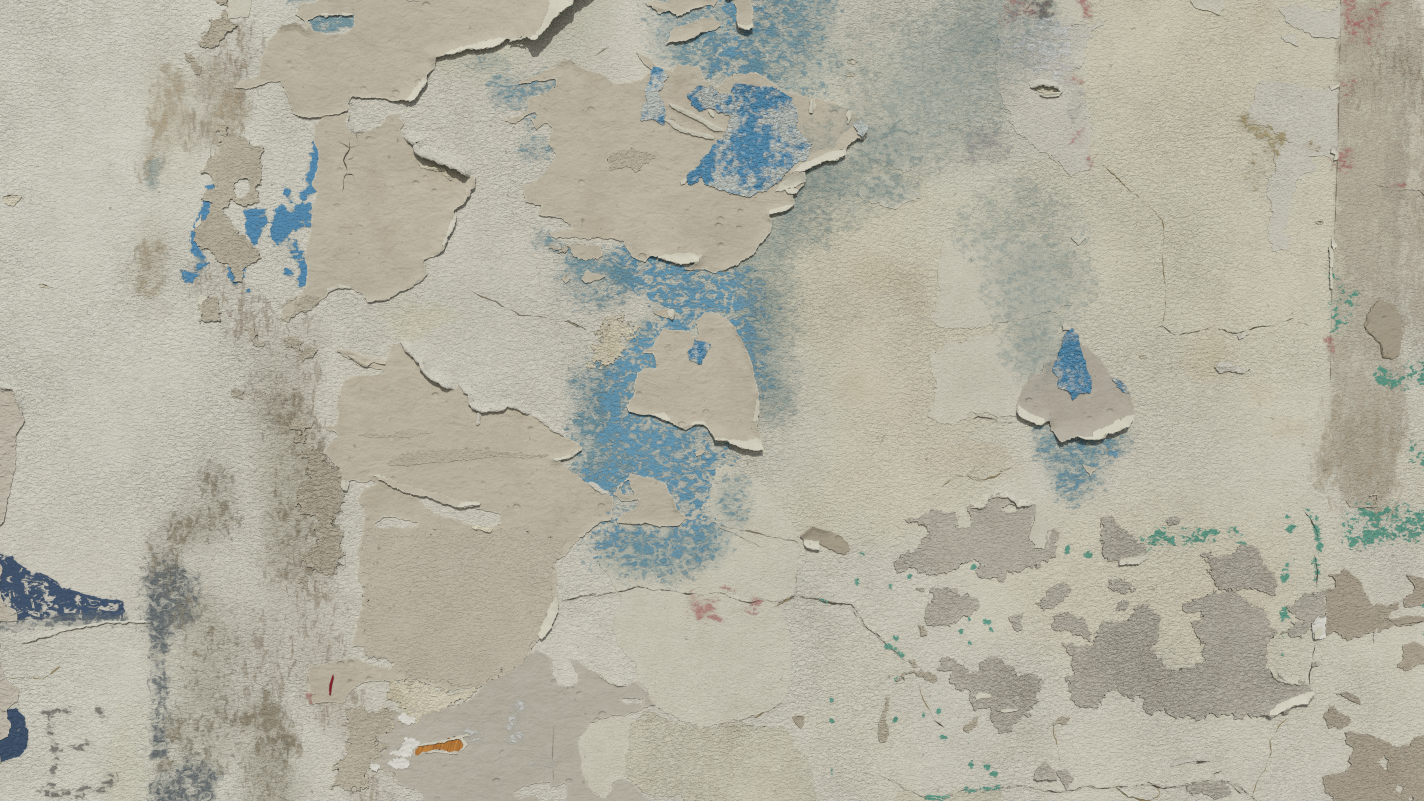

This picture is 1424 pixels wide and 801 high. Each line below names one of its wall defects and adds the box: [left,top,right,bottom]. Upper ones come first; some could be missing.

peeling [194,132,264,282]
peeling [235,0,573,362]
peeling [505,52,868,283]
peeling [586,308,764,456]
peeling [1017,324,1136,442]
peeling [0,663,19,740]
peeling [294,336,687,801]
crack [562,521,943,727]
peeling [896,656,1044,734]
peeling [894,489,1059,636]
peeling [1036,516,1424,725]
peeling [1323,692,1424,801]